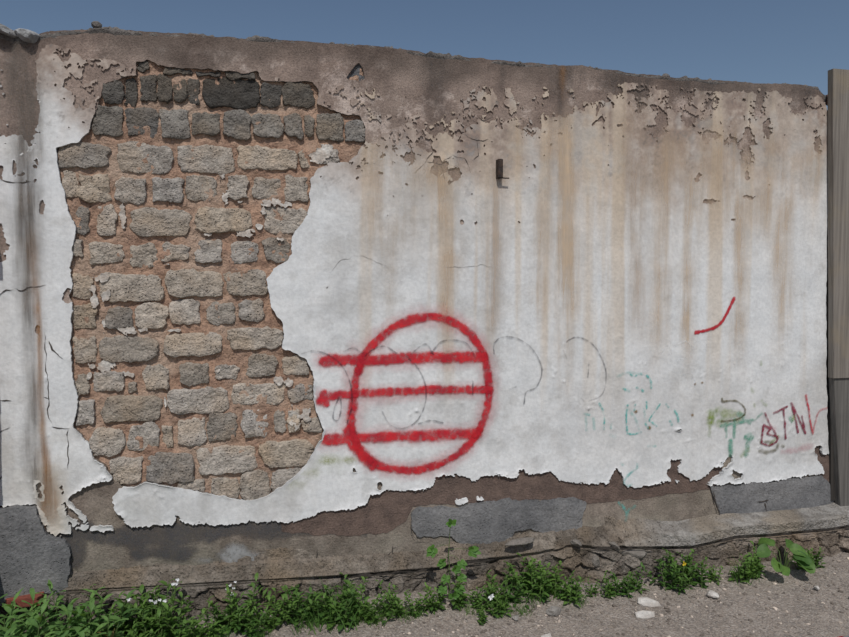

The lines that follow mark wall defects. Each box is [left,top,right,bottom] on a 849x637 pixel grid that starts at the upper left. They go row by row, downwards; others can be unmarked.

spalling [0,30,829,500]
water stain [558,128,573,293]
crack [44,333,69,467]
peeling [281,459,722,536]